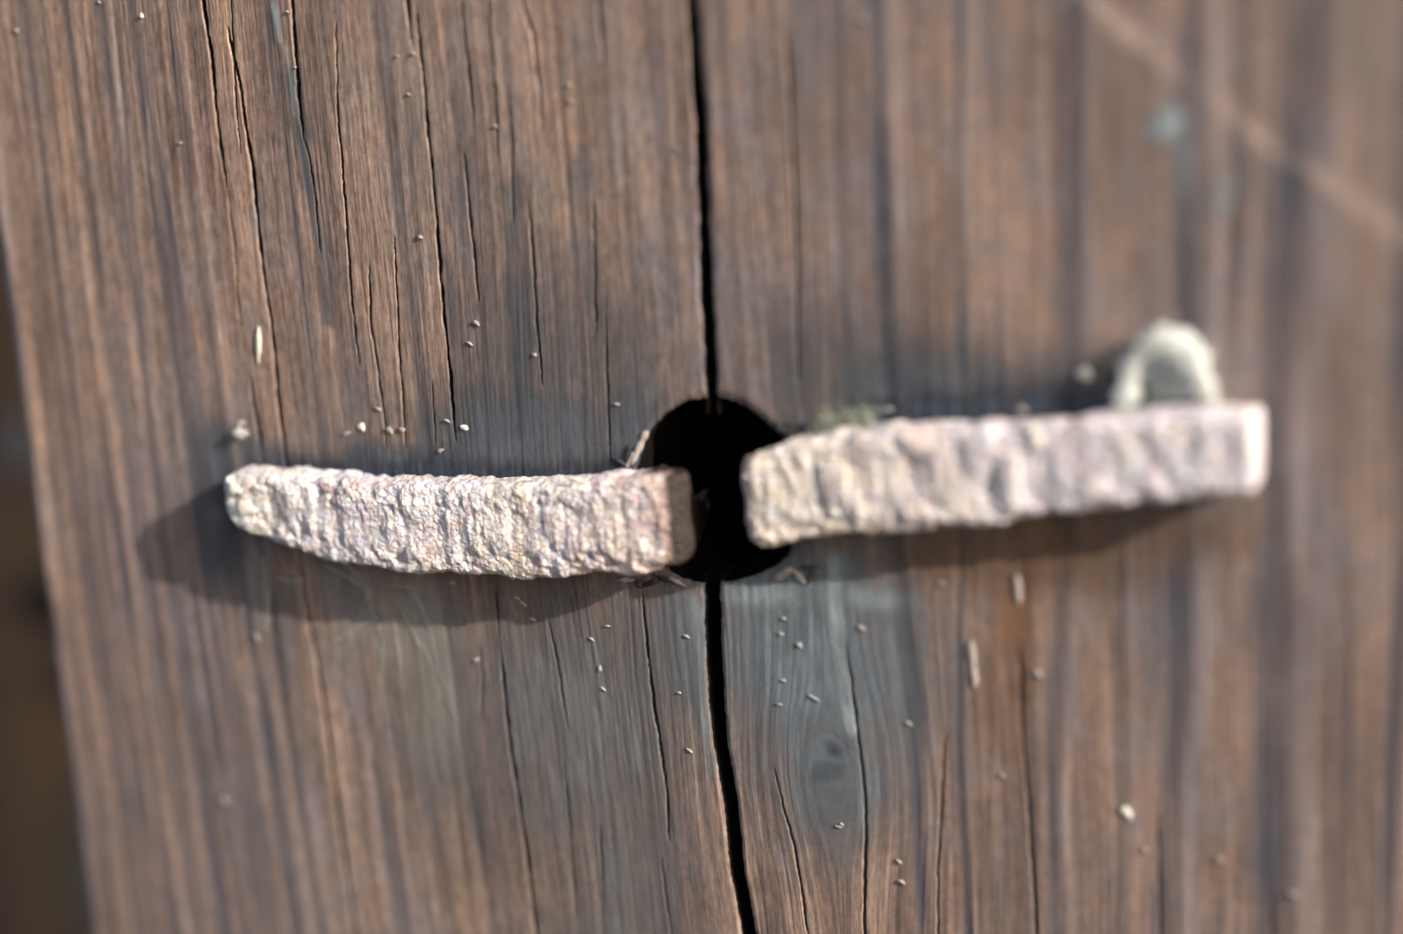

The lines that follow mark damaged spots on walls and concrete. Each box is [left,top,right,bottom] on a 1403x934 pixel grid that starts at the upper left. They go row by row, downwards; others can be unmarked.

crack [202,0,290,468]
crack [687,0,738,414]
crack [481,587,539,934]
crack [567,784,604,914]
crack [705,540,764,934]
crack [774,769,808,930]
crack [845,646,868,934]
crack [936,736,946,934]
crack [1019,649,1039,934]